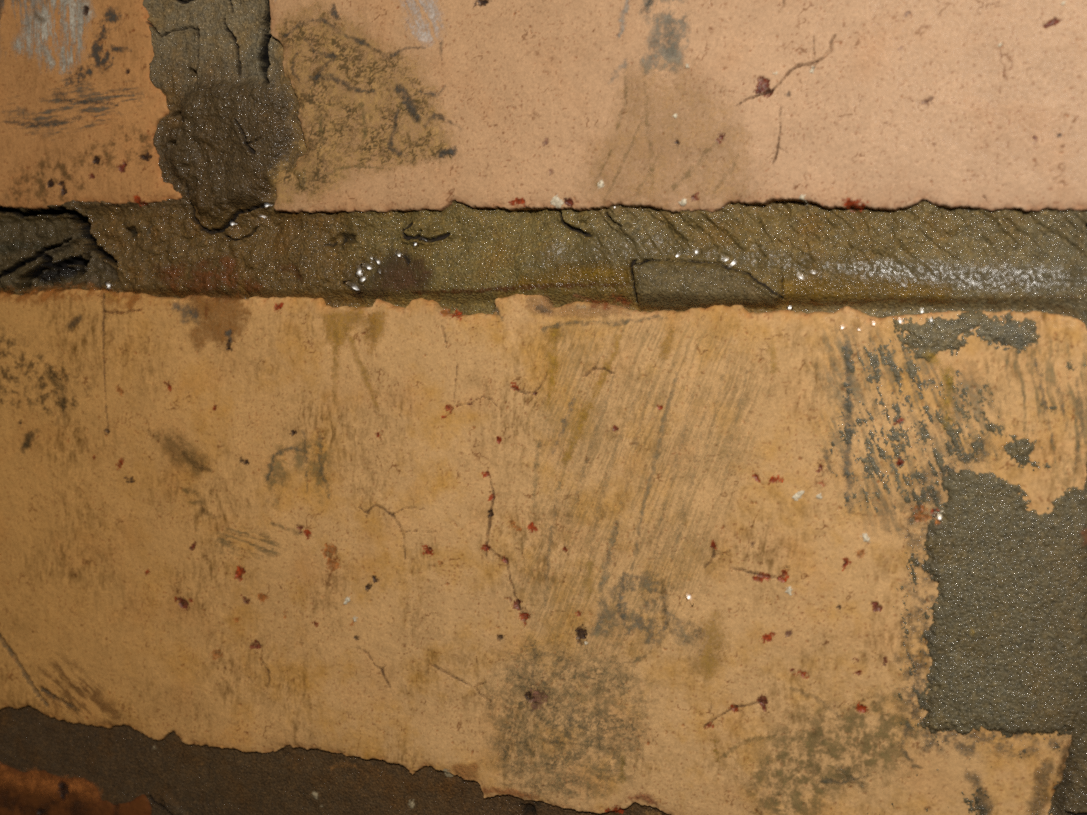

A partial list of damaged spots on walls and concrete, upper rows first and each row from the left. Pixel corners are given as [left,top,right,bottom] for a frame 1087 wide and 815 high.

crack [148,0,200,36]
crack [225,0,271,83]
water stain [274,7,456,202]
crack [0,206,118,278]
water stain [968,776,990,815]